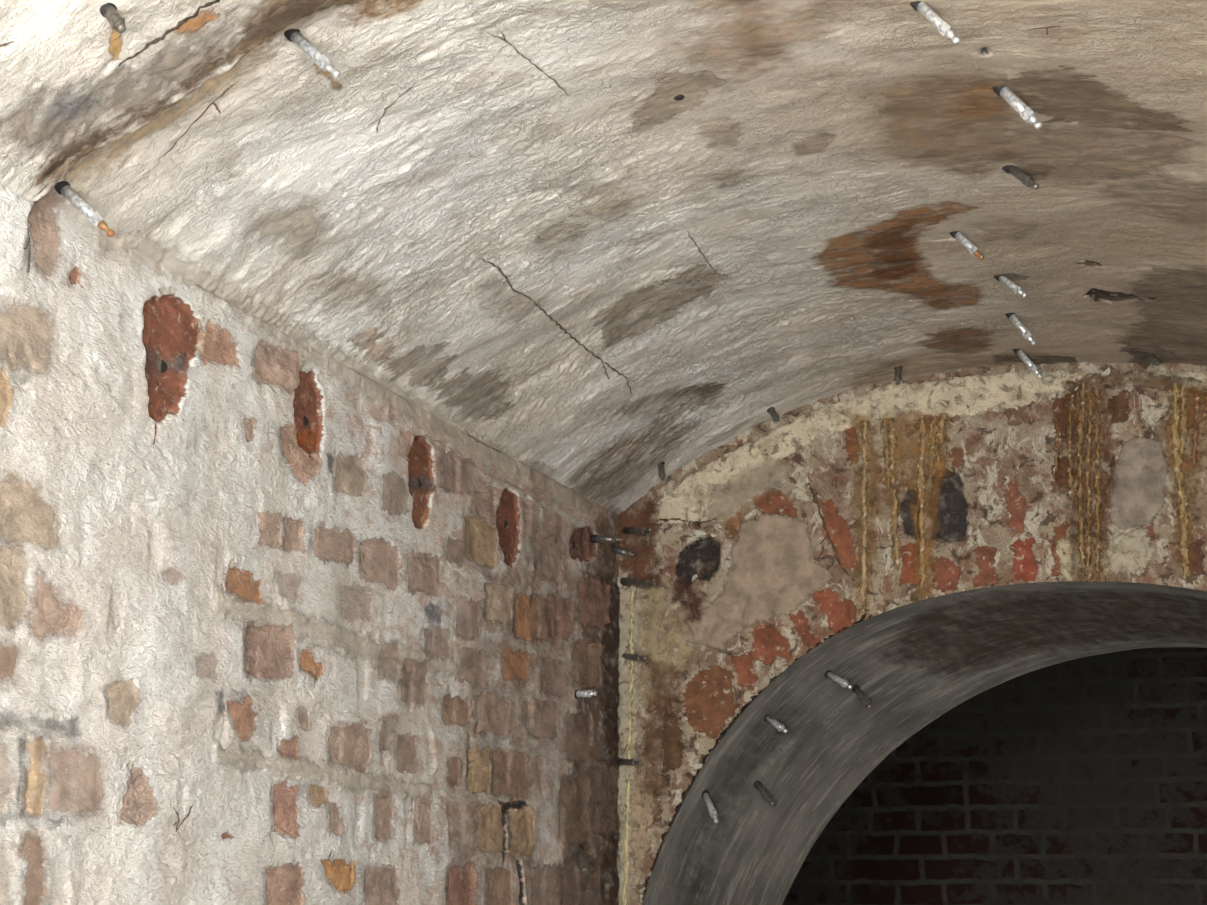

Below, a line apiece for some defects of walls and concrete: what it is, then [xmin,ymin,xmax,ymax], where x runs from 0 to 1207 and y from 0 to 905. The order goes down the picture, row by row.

crack [118,0,220,67]
leakage [0,0,413,189]
crack [487,32,568,95]
leakage [984,65,1207,224]
spalling [142,286,368,497]
peeling [257,484,611,727]
crack [479,258,637,394]
rust [813,202,983,309]
rust [851,412,950,613]
flaking render [651,367,1207,622]
rust [1057,381,1114,582]
leakage [1120,268,1207,366]